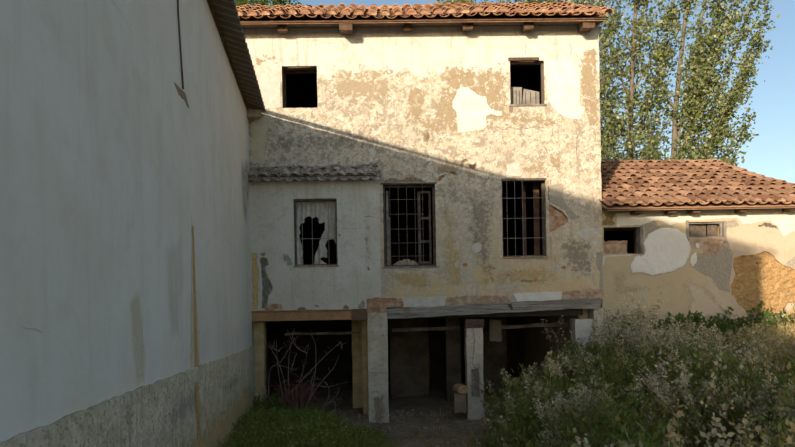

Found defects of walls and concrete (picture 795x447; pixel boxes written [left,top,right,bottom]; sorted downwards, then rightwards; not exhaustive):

flaking render [328,63,555,142]
flaking render [579,49,599,126]
flaking render [437,159,476,181]
flaking render [522,154,561,175]
peeling [548,184,580,232]
peeling [616,208,795,237]
flaking render [562,251,604,299]
peeling [689,238,733,292]
flaking render [343,297,404,313]